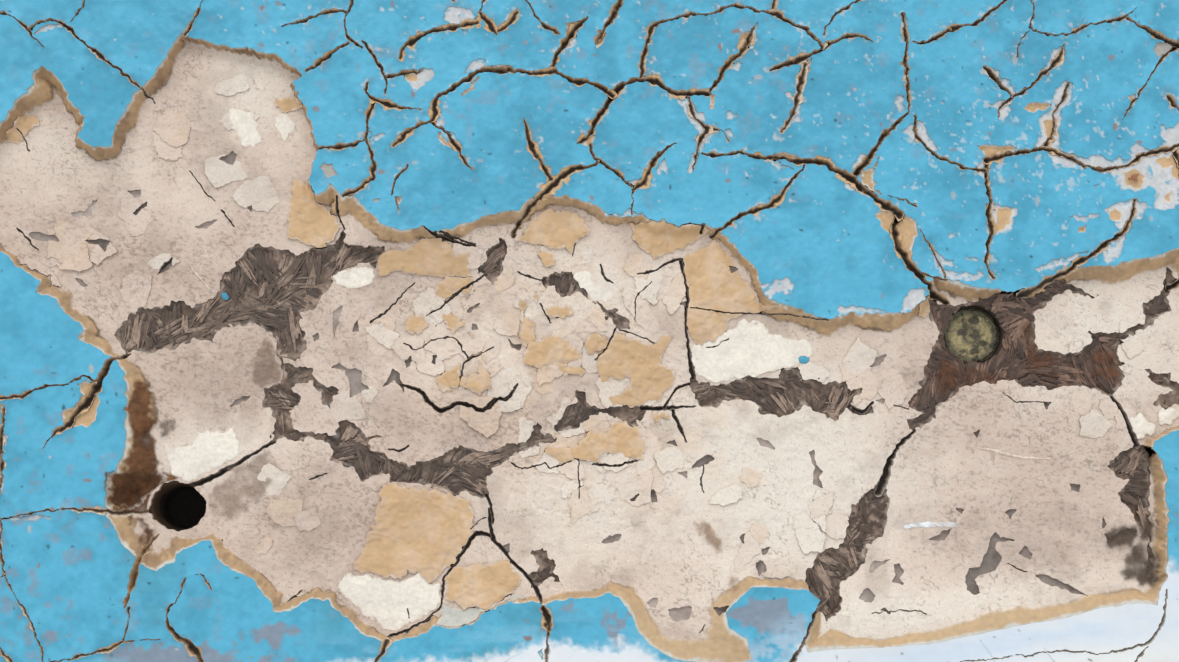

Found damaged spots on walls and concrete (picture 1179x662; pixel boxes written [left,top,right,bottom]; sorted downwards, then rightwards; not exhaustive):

crack [0,0,156,104]
peeling [553,81,803,229]
crack [281,0,1179,305]
peeling [721,164,930,319]
peeling [0,509,136,662]
crack [0,354,212,662]
corrosion [105,381,176,543]
peeling [164,427,239,481]
peeling [61,540,382,662]
crack [538,605,554,662]
peeling [805,450,1169,652]
crack [960,589,1168,662]